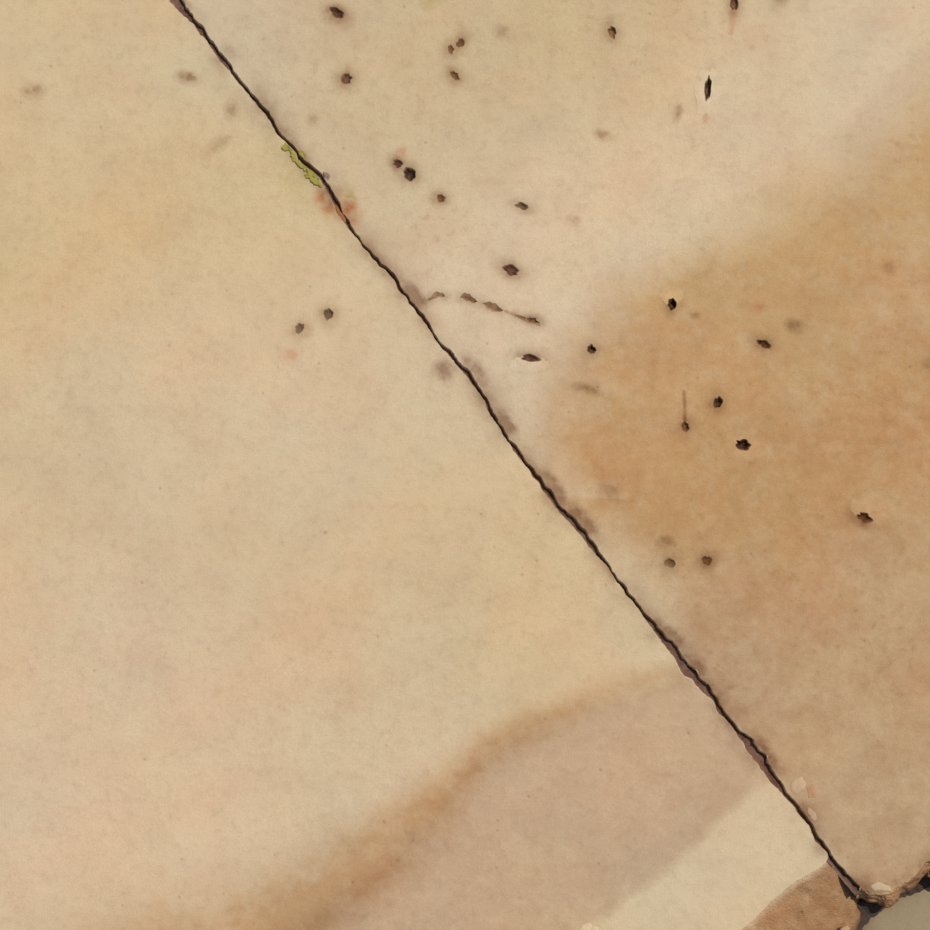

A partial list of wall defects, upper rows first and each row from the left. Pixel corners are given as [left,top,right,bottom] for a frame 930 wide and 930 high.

damp [781,316,809,335]
damp [564,380,607,398]
crack [170,0,860,895]
damp [2,653,769,930]
spalling [790,777,817,821]
spalling [742,860,930,930]